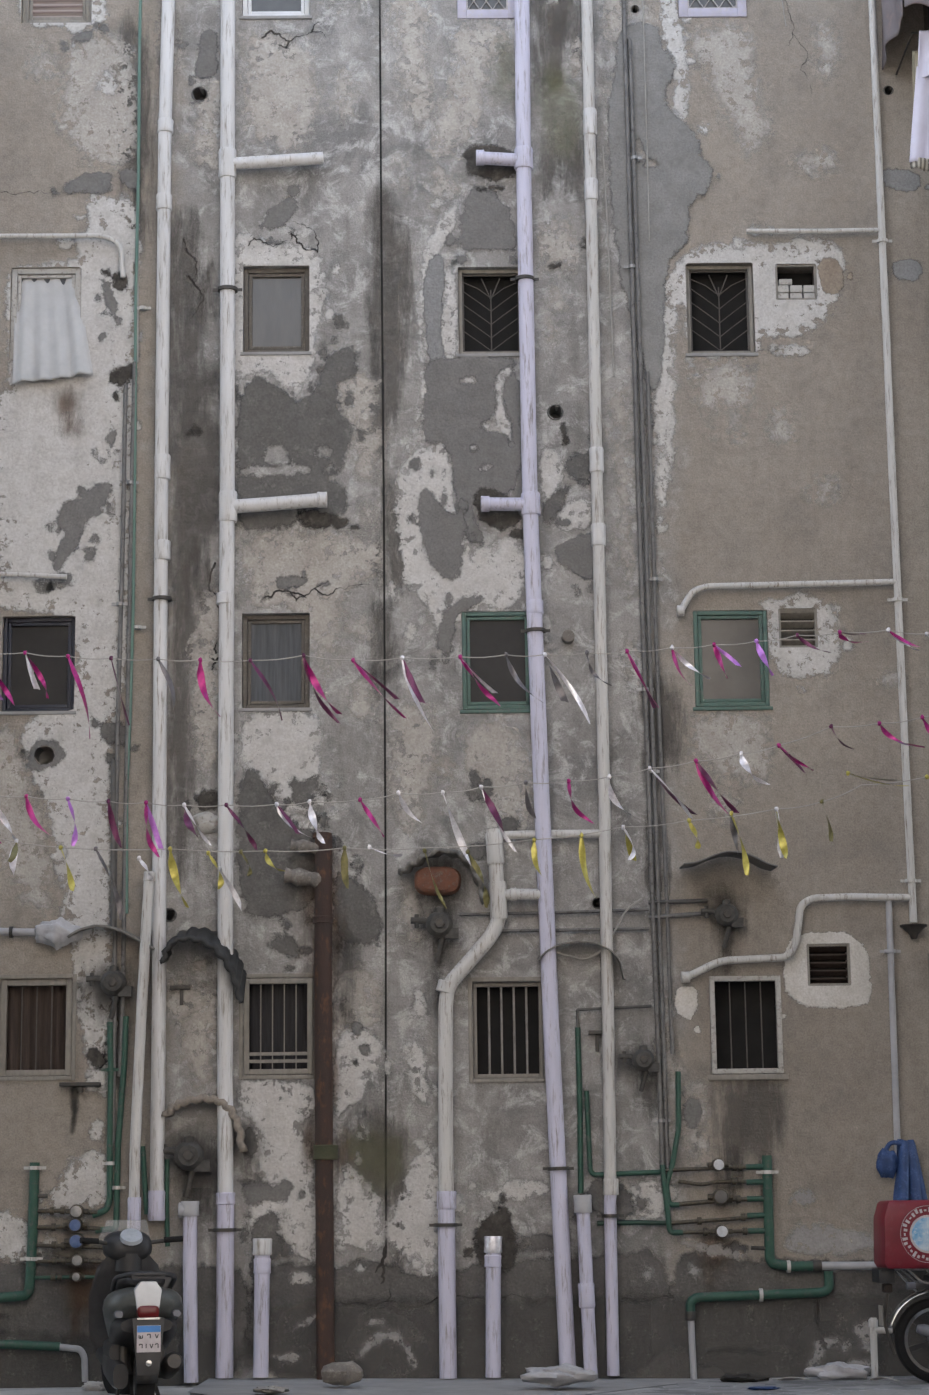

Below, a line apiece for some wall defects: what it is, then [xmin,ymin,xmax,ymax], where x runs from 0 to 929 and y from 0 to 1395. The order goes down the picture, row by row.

crack [261,22,325,49]
crack [248,223,319,253]
flaking render [235,185,365,530]
flaking render [388,144,594,669]
peeling [645,224,853,534]
peeling [0,168,143,1097]
crack [264,581,363,601]
peeling [0,1119,114,1263]
peeling [237,1079,316,1285]
leakage [342,1112,407,1202]
peeling [334,1124,439,1277]
spalling [455,1178,550,1273]